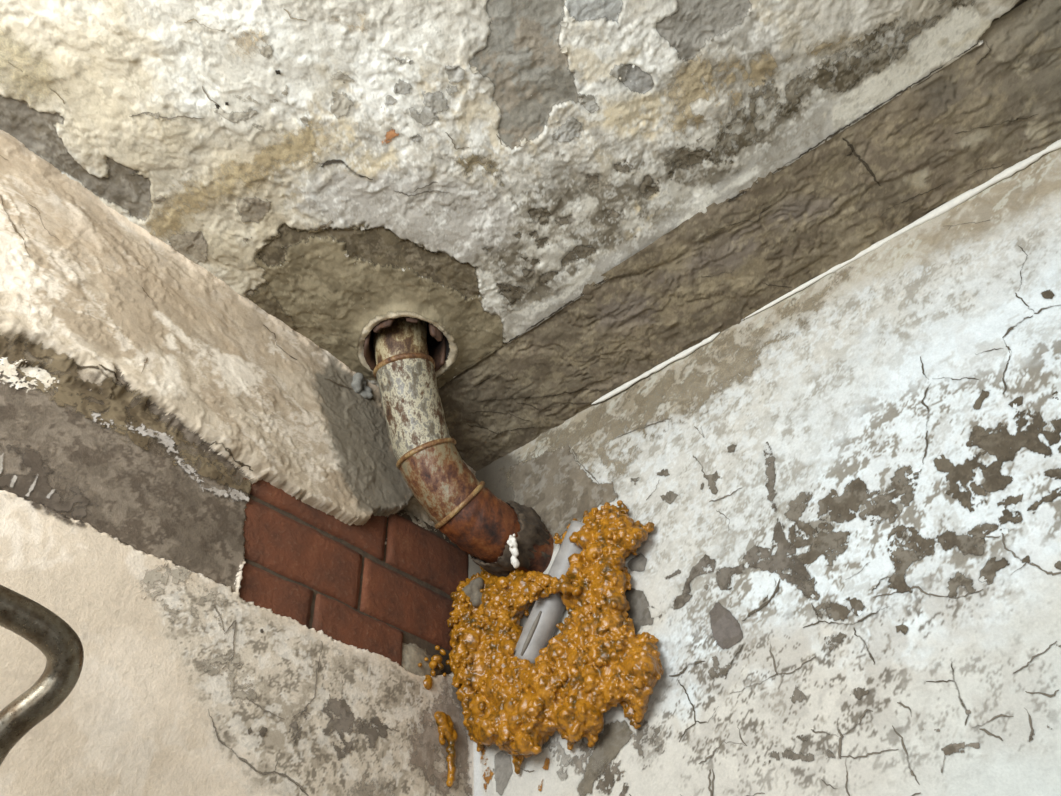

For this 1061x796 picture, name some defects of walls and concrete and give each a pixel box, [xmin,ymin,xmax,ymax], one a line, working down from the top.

spalling [384,0,623,149]
spalling [610,64,653,94]
spalling [656,0,754,61]
spalling [258,221,480,300]
crack [920,246,1059,463]
flaking render [0,357,469,677]
peeling [625,396,1061,678]
crack [669,579,814,742]
crack [803,566,983,664]
crack [926,641,1059,742]
corrosion [480,747,494,789]
crack [811,702,945,796]